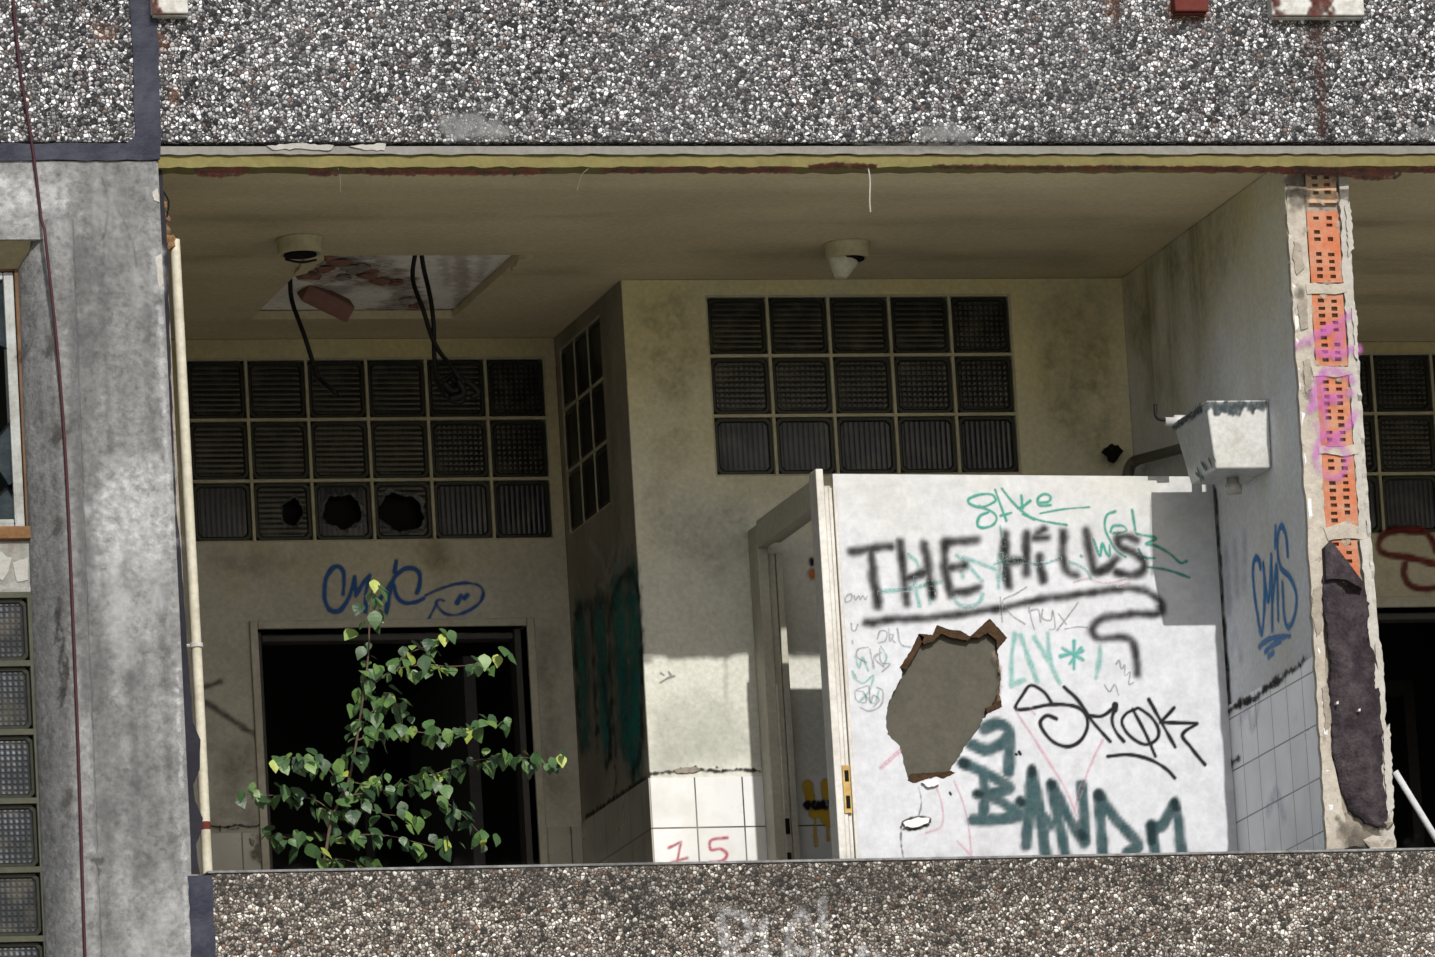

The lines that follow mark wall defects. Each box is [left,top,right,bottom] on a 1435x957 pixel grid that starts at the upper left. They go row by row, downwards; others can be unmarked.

rust [1307,0,1334,130]
flaking render [1344,201,1354,257]
spalling [294,255,427,310]
flaking render [1292,241,1308,330]
flaking render [1351,308,1359,360]
flaking render [1310,586,1323,636]
spalling [900,619,1007,670]
spalling [985,692,1002,715]
flaking render [1322,685,1332,731]
flaking render [1374,644,1394,815]
spalling [908,771,955,788]
spalling [903,817,930,828]